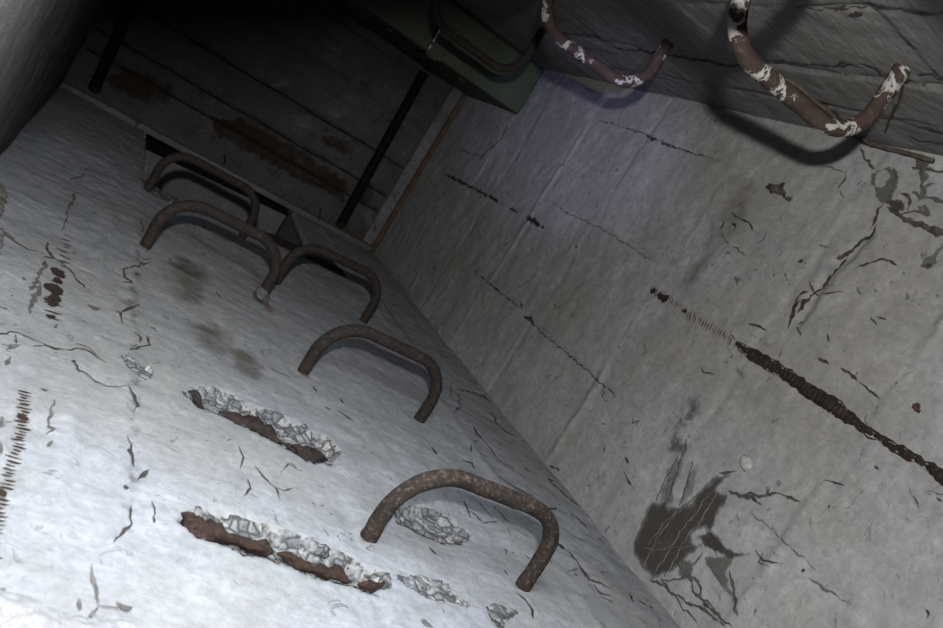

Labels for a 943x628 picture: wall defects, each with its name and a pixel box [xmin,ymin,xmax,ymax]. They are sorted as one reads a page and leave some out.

crack [0,416,8,454]
corrosion [0,389,32,534]
crack [41,387,56,447]
corrosion [43,234,72,320]
crack [0,174,171,410]
crack [114,436,156,542]
spalling [182,386,342,465]
crack [474,271,616,397]
crack [749,226,896,335]
crack [818,334,880,399]
spalling [180,505,474,608]
spalling [486,603,519,628]